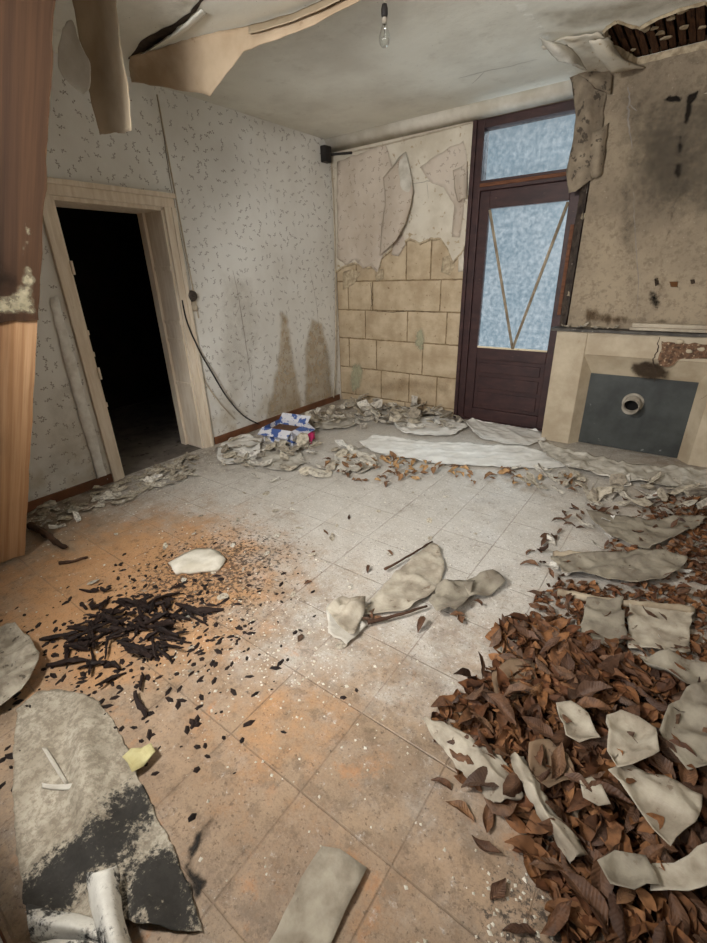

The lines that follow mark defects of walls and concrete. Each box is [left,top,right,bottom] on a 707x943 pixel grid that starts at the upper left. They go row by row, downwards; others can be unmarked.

crack [128,0,207,59]
water stain [641,91,707,201]
water stain [270,318,331,414]
flaking render [336,234,465,417]
spalling [658,339,707,367]